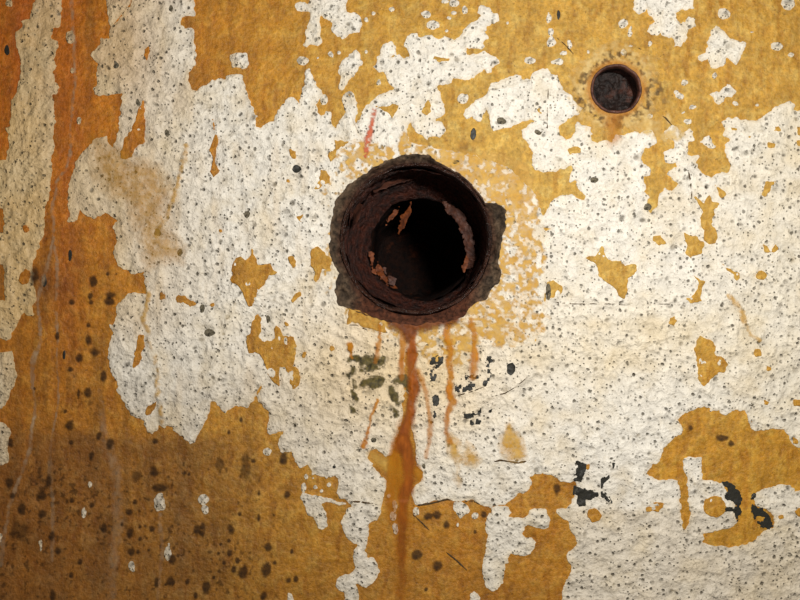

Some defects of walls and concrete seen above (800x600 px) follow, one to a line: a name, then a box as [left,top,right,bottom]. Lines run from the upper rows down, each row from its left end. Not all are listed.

peeling [633,0,696,47]
peeling [0,0,75,341]
corrosion [386,202,412,234]
corrosion [442,201,477,273]
peeling [67,0,506,600]
water stain [69,337,98,371]
corrosion [469,319,479,379]
peeling [398,68,800,600]
corrosion [376,319,459,543]
water stain [151,467,167,491]
water stain [121,523,154,555]
water stain [218,525,247,578]